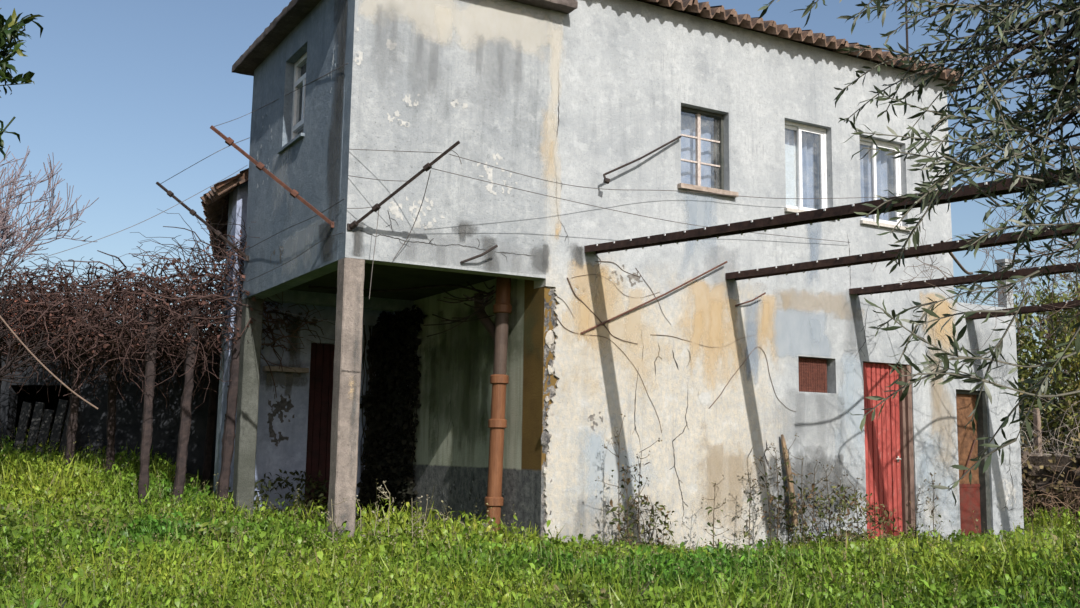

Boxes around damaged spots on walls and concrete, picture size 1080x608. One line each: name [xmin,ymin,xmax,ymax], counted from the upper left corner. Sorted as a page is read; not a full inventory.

peeling [387,94,420,127]
peeling [477,153,517,195]
peeling [388,197,445,230]
flaking render [541,284,589,538]